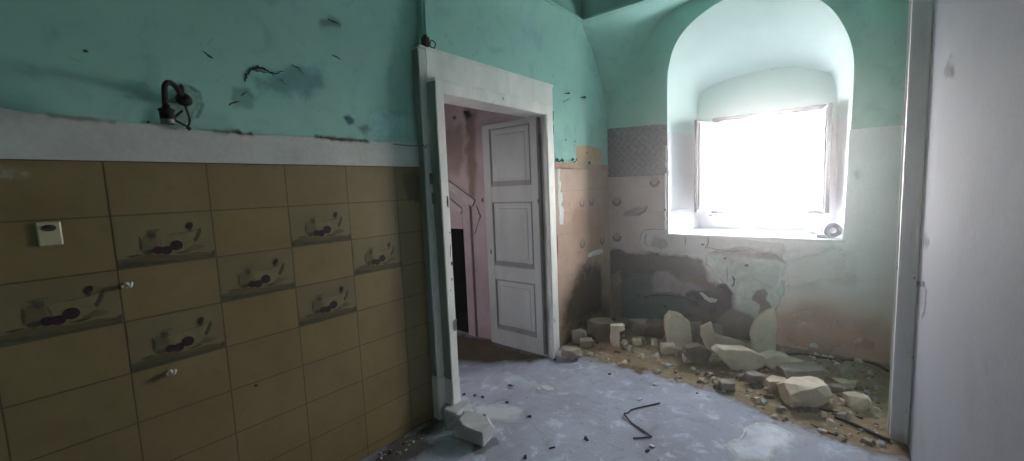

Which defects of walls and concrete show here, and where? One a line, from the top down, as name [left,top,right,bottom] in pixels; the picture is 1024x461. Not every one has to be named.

crack [229,65,302,106]
peeling [637,228,787,319]